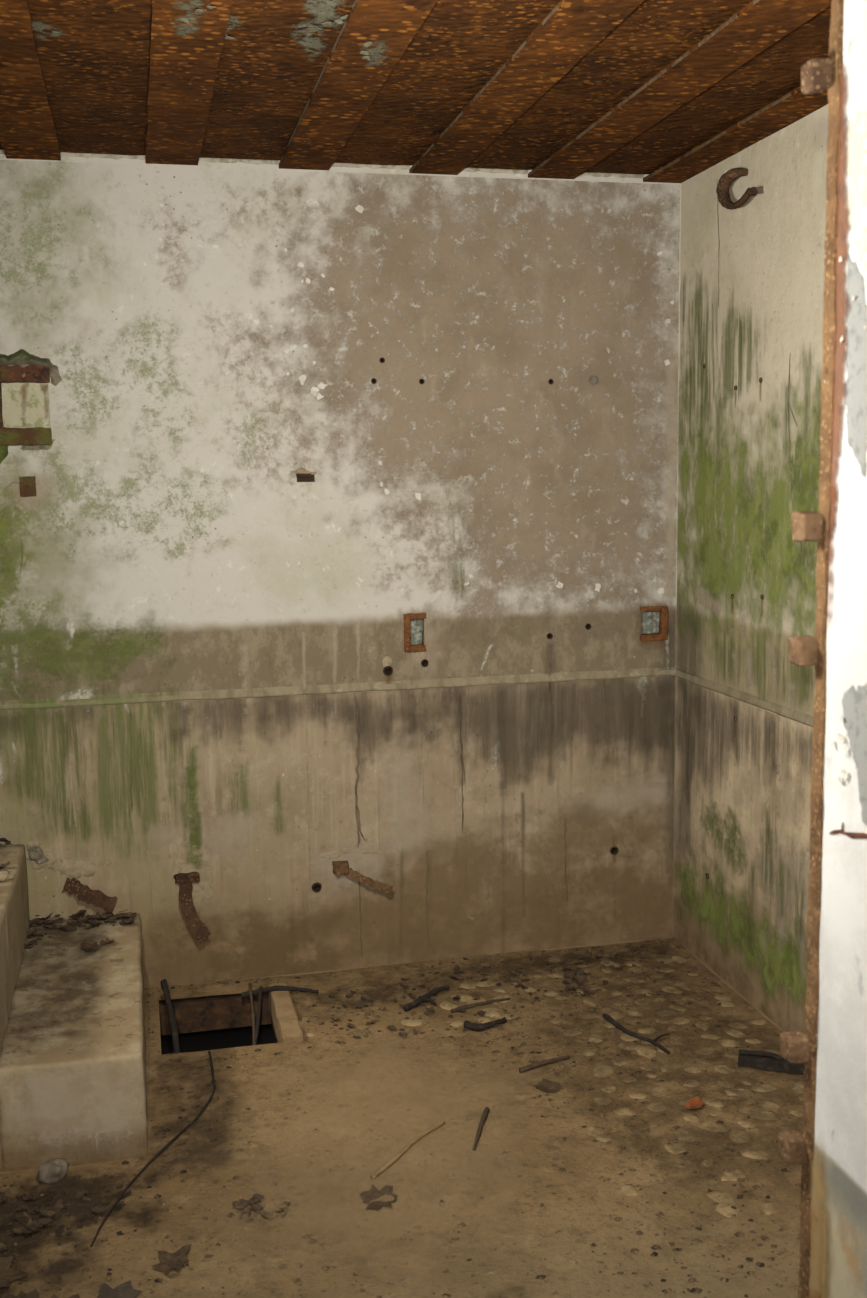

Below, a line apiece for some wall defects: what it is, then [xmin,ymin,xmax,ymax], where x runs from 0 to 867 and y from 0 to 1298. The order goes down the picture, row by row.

spalling [0,349,62,386]
damp [61,675,92,716]
damp [458,636,670,771]